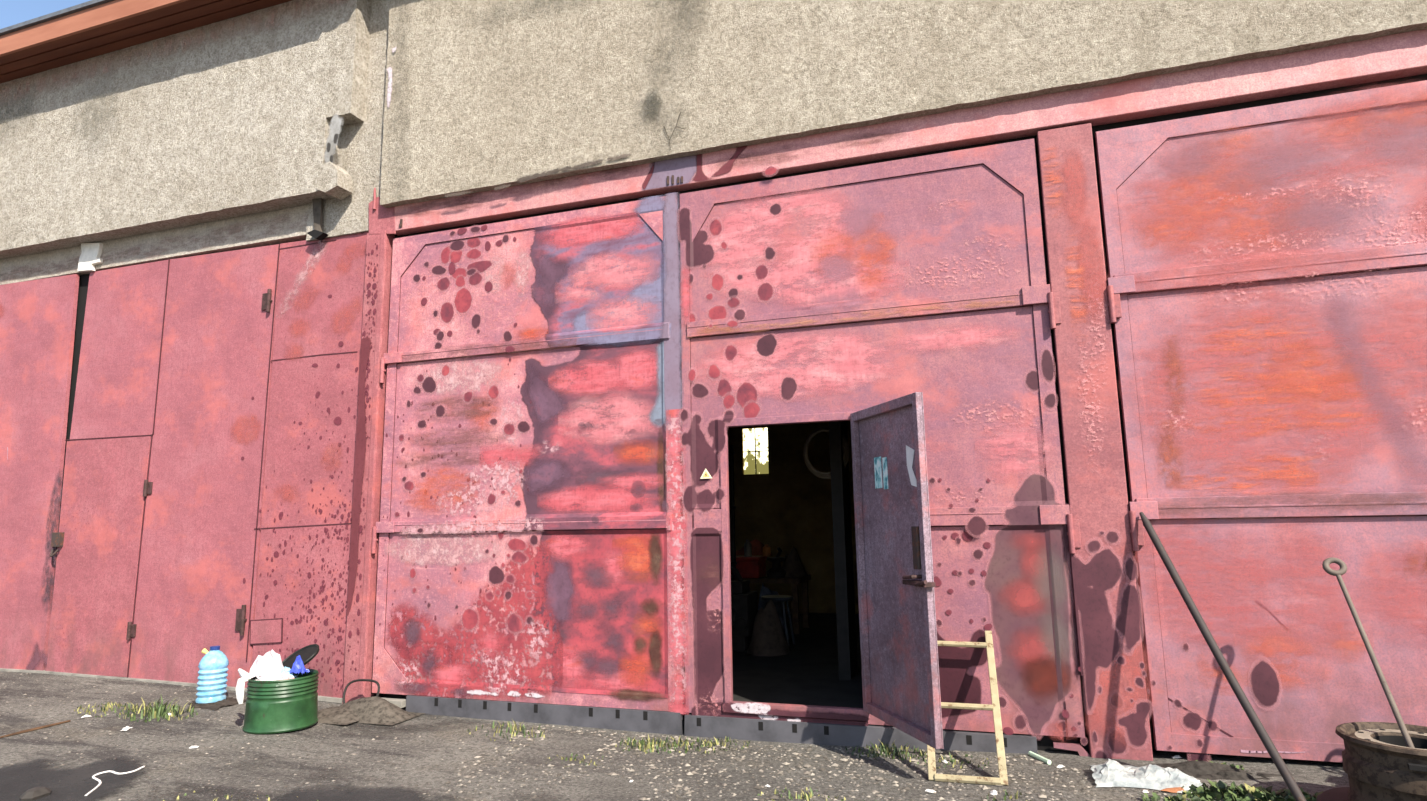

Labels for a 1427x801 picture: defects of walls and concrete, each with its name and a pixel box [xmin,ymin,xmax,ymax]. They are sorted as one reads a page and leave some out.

damp [645,92,660,117]
peeling [467,622,549,698]
peeling [399,663,420,684]